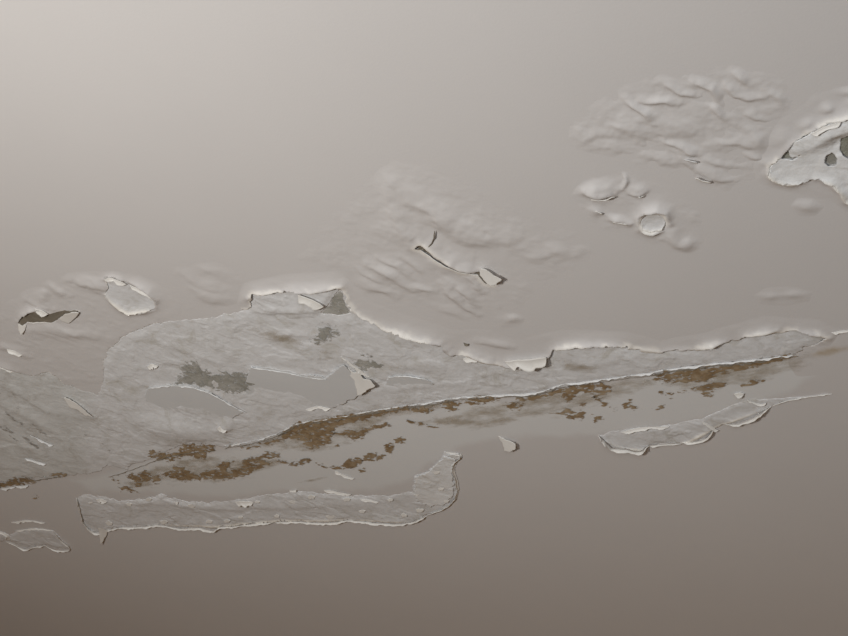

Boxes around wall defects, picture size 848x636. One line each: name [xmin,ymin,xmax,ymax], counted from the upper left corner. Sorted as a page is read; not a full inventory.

peeling [752,85,848,212]
peeling [104,277,155,316]
peeling [0,289,848,491]
corrosion [652,353,796,410]
corrosion [113,382,612,494]
peeling [0,520,70,553]
peeling [76,451,462,544]